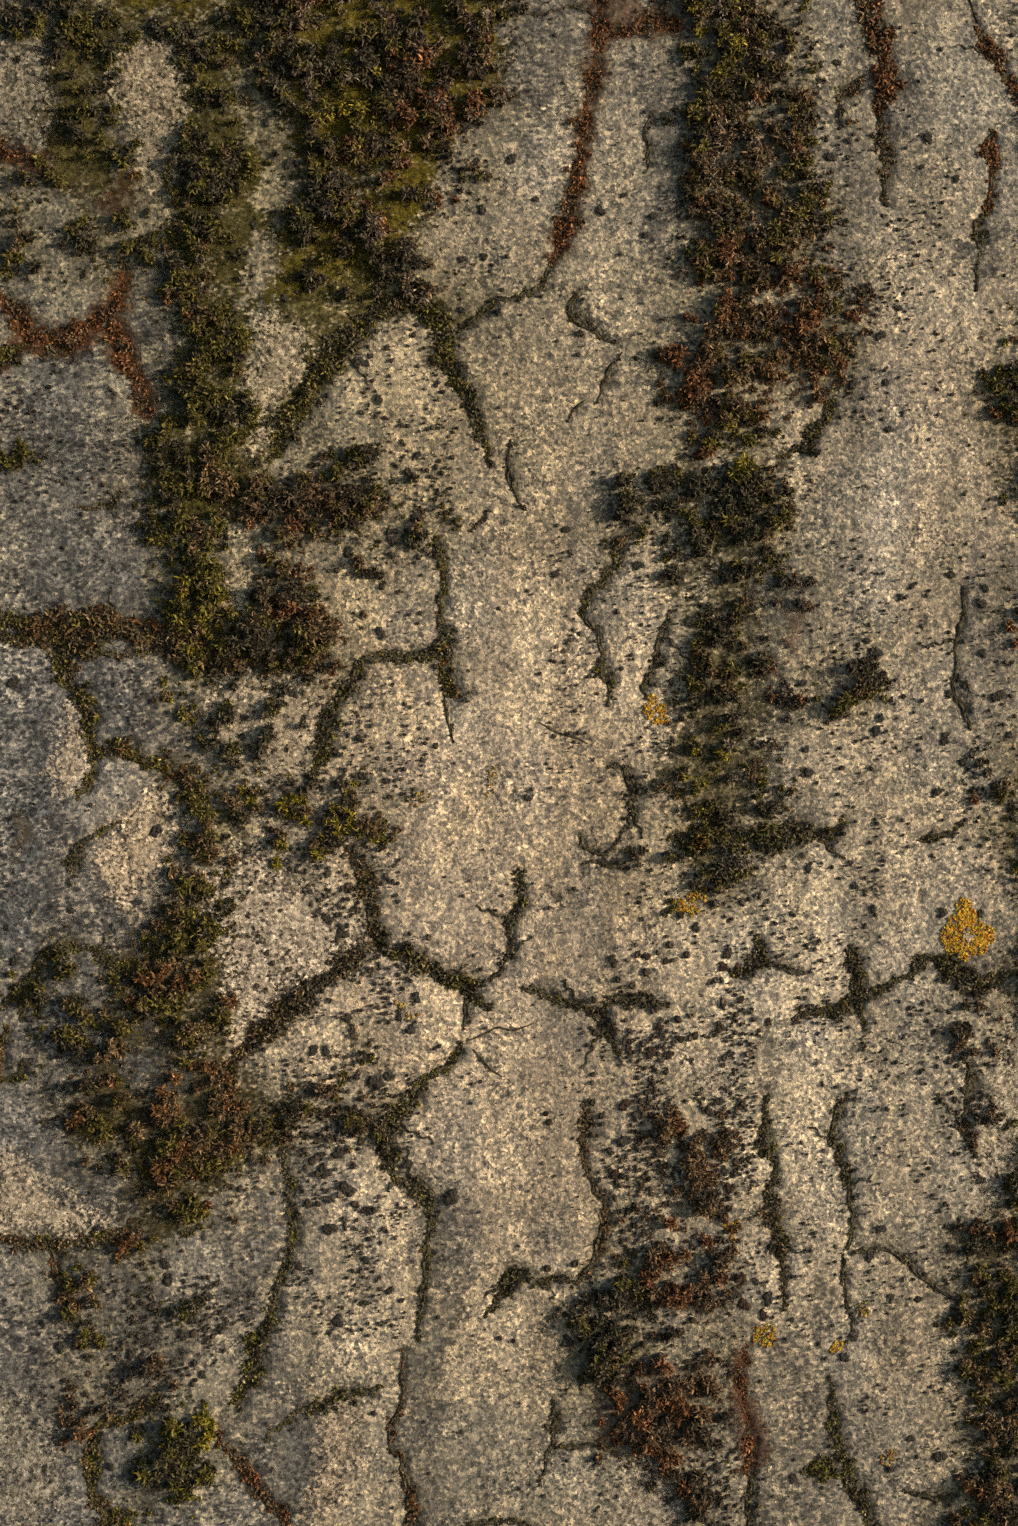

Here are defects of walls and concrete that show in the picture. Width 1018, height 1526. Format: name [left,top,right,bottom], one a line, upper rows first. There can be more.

damp [0,0,62,83]
damp [118,85,166,167]
crack [836,0,911,208]
crack [953,0,1018,292]
damp [0,329,179,624]
damp [128,234,193,432]
crack [0,0,691,887]
damp [741,543,807,800]
crack [540,722,847,873]
crack [729,933,1018,1032]
crack [214,844,671,1526]
crack [755,1091,960,1333]